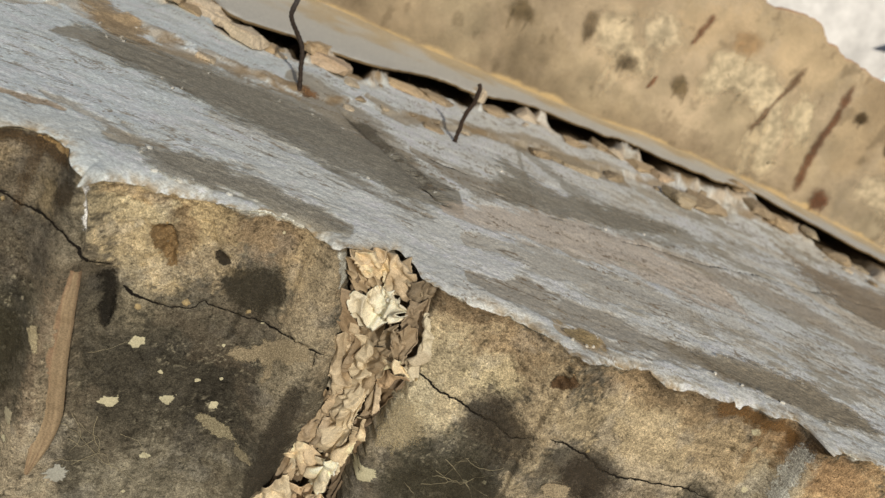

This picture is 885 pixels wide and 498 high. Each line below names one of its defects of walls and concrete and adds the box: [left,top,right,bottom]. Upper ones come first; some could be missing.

peeling [72,0,461,207]
peeling [136,145,351,233]
crack [0,190,113,264]
crack [123,285,325,365]
water stain [215,262,288,314]
peeling [782,257,885,332]
crack [415,371,490,421]
water stain [469,401,537,464]
water stain [558,457,616,498]
crack [550,439,709,498]
water stain [718,403,815,498]
peeling [693,351,885,436]